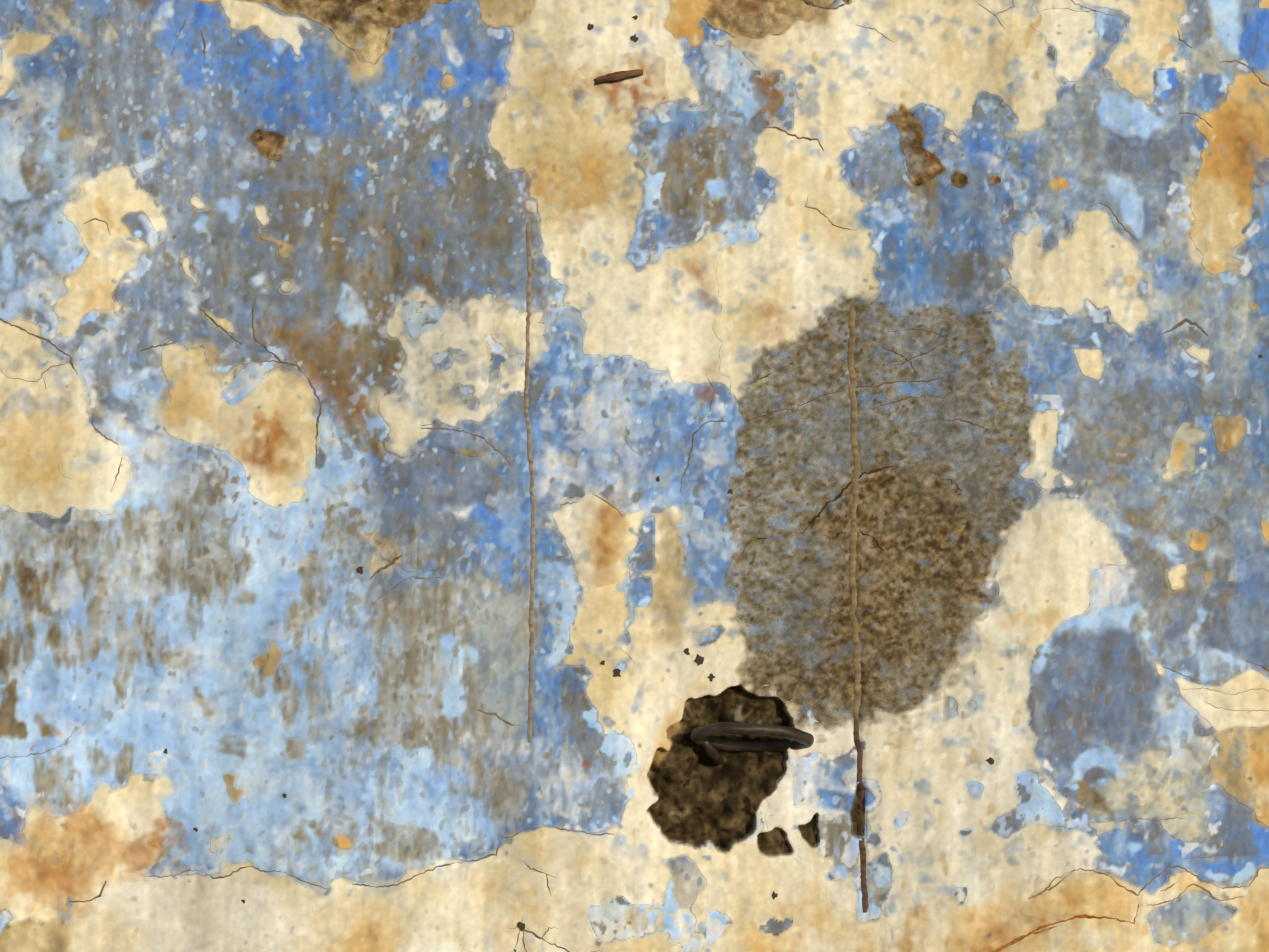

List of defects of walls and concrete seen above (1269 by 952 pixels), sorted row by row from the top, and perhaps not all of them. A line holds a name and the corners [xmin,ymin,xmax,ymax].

spalling [195,0,452,64]
corrosion [600,72,651,103]
peeling [190,197,205,209]
peeling [254,205,294,258]
peeling [379,0,1186,458]
crack [0,318,78,389]
crack [140,339,182,351]
peeling [204,311,235,333]
crack [200,294,322,465]
crack [90,421,122,491]
peeling [0,410,1269,952]
crack [995,854,1268,952]